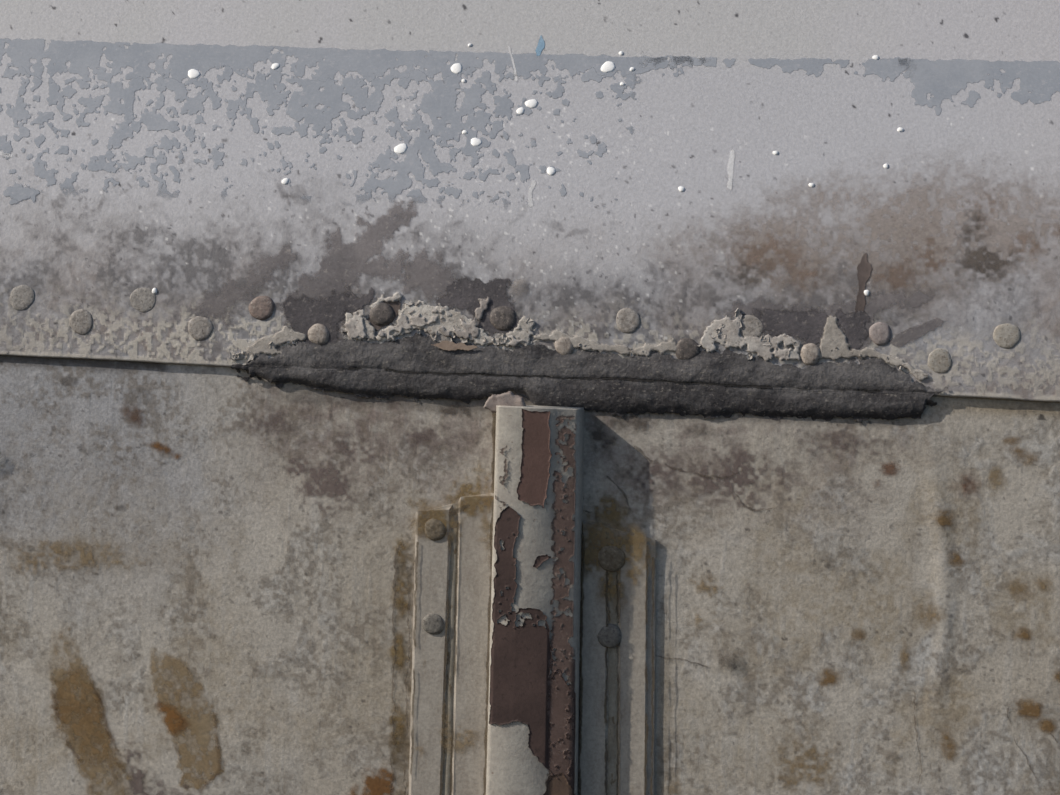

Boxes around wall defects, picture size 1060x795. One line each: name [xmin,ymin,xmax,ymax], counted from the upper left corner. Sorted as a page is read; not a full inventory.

peeling [748,57,1060,115]
peeling [0,38,948,422]
peeling [489,409,576,795]
rust [53,643,130,795]
rust [151,655,224,789]
rust [351,769,394,795]